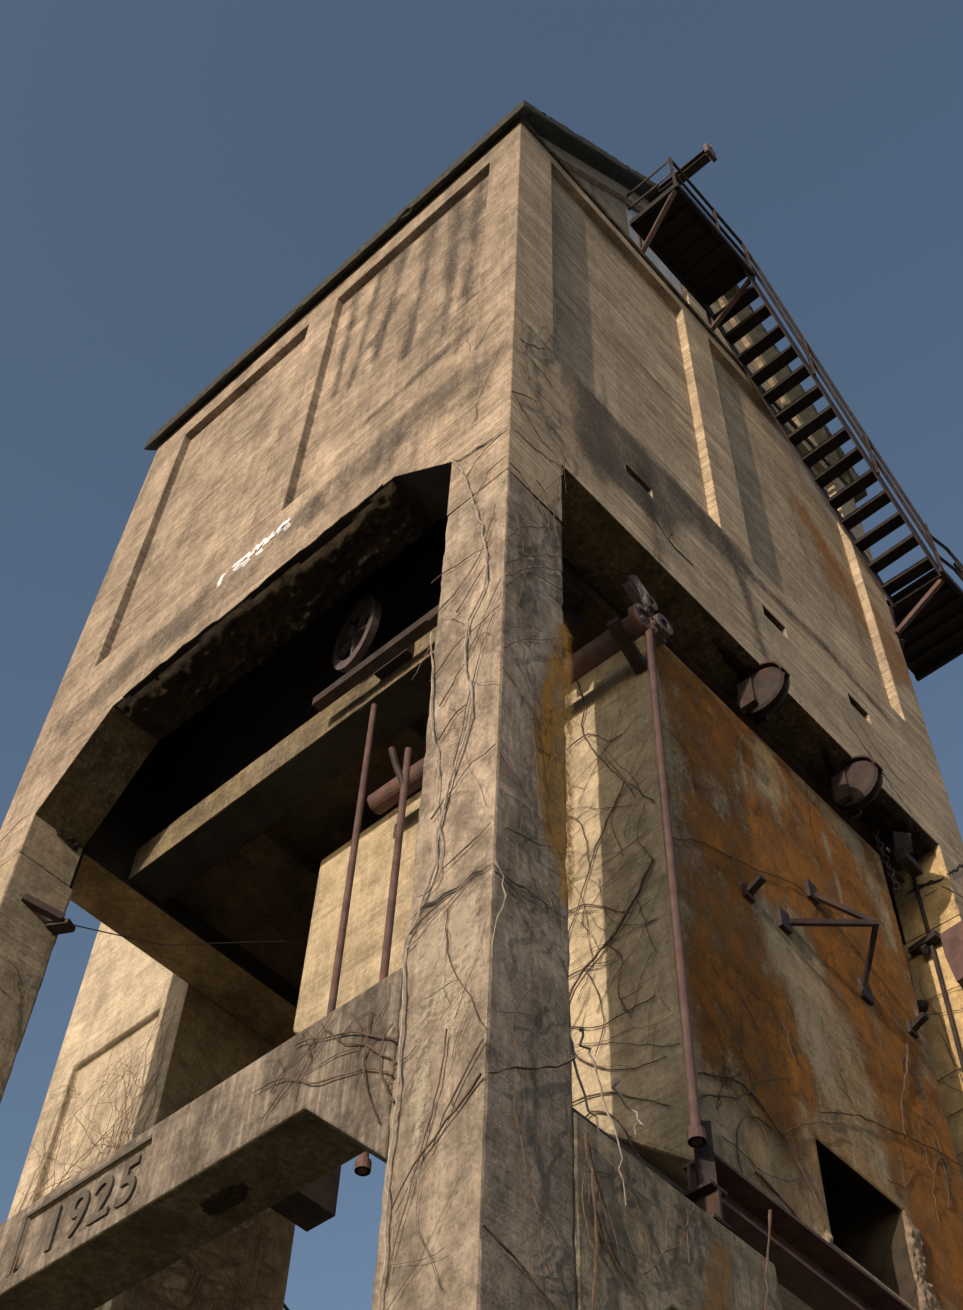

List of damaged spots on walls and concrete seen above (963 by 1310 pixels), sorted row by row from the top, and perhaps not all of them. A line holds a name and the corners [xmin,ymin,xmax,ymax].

water stain [333,183,485,395]
water stain [110,592,223,688]
water stain [301,373,468,517]
rust [534,624,574,906]
water stain [563,367,887,717]
rust [654,639,963,1310]